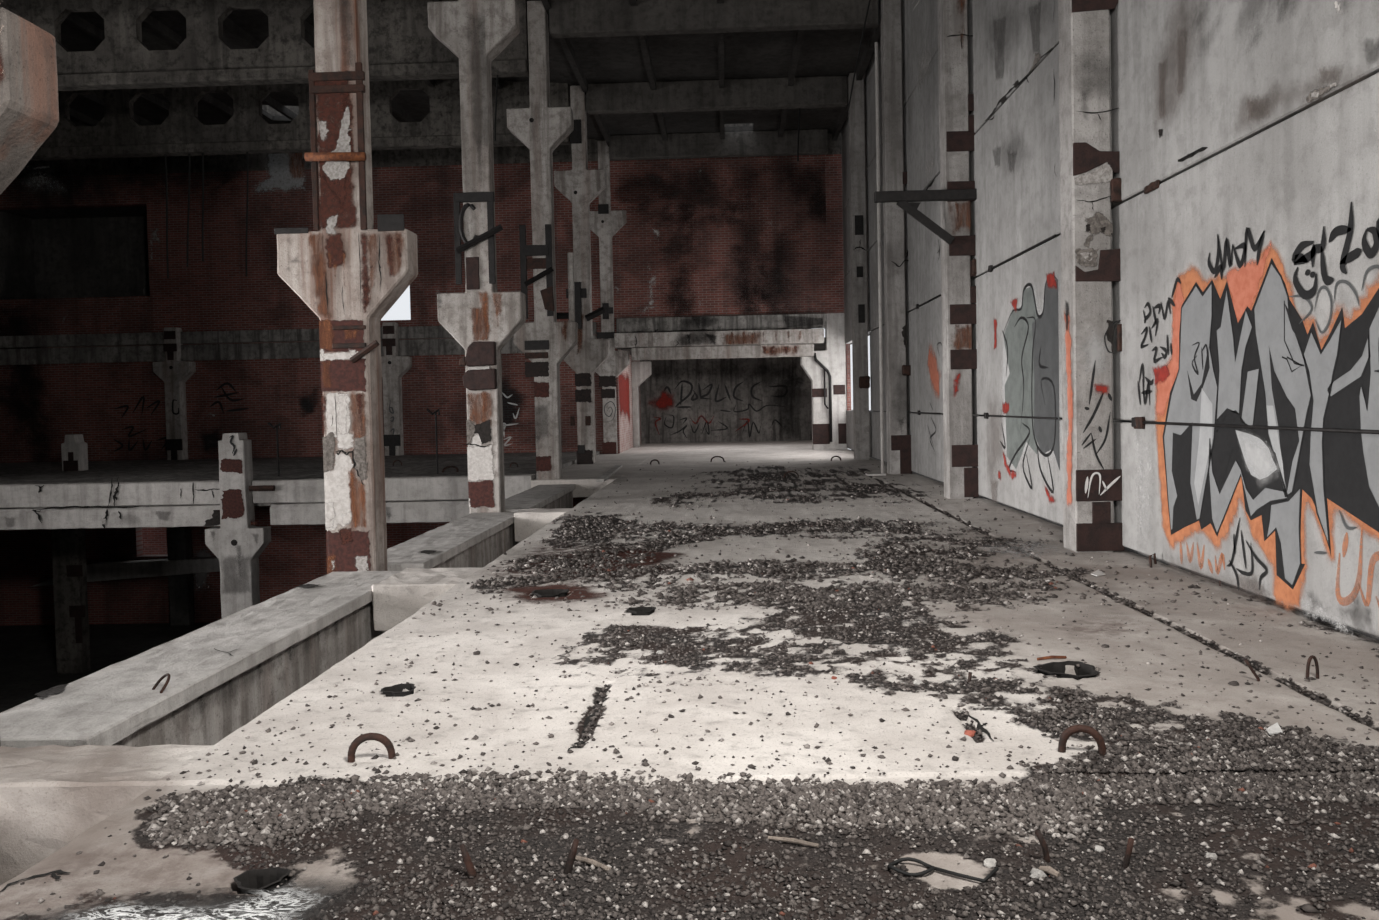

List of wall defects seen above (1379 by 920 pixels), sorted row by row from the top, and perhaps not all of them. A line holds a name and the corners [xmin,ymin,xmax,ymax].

spalling [318,101,351,180]
spalling [326,215,338,234]
rust [308,80,403,438]
peeling [322,393,368,530]
peeling [466,420,495,481]